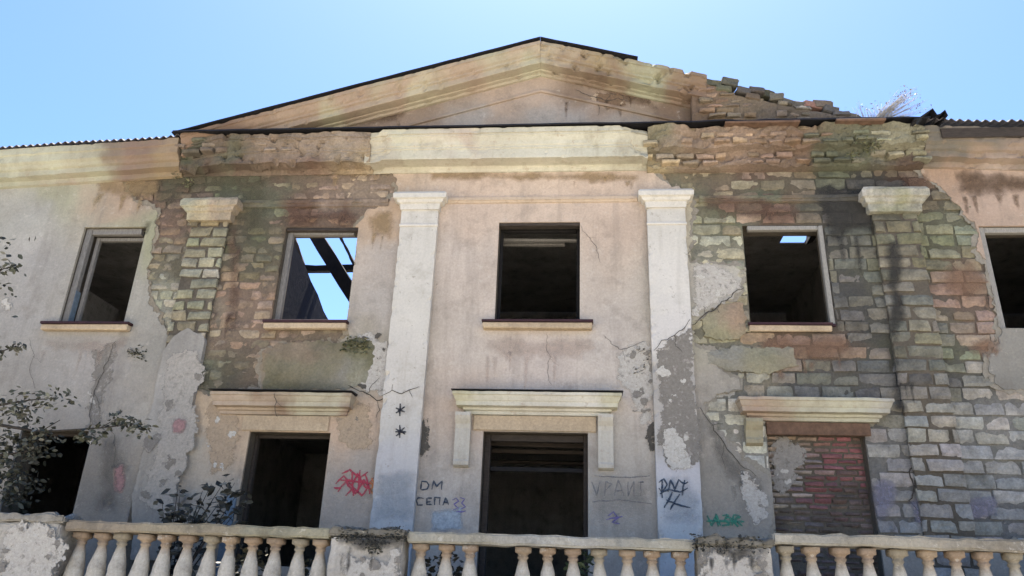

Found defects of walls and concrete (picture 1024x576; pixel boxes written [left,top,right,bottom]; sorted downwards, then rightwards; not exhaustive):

water stain [960,173,1024,206]
crack [89,341,116,422]
spalling [125,174,398,513]
crack [348,378,415,417]
crack [608,288,743,358]
spalling [617,170,1024,540]
water stain [889,242,904,334]
water stain [896,382,914,409]
peeling [0,520,69,576]